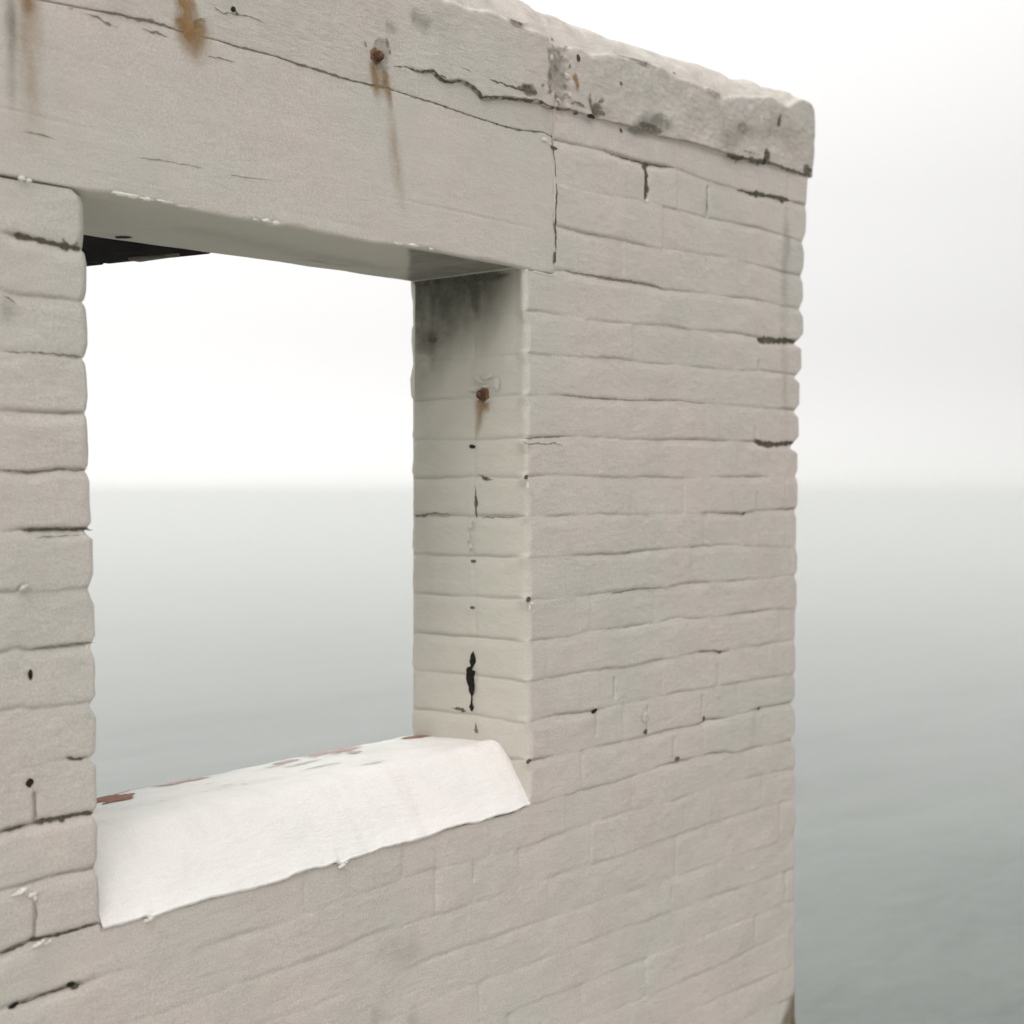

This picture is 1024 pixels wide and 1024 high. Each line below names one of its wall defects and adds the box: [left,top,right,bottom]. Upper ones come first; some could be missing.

corrosion [177,0,203,47]
corrosion [372,63,390,94]
spalling [518,39,605,116]
crack [209,42,663,289]
crack [727,151,812,177]
crack [737,189,790,203]
damp [414,256,504,350]
crack [757,336,795,344]
crack [755,438,793,448]
crack [454,651,478,733]
peeling [274,747,360,764]
flaking render [97,788,139,804]